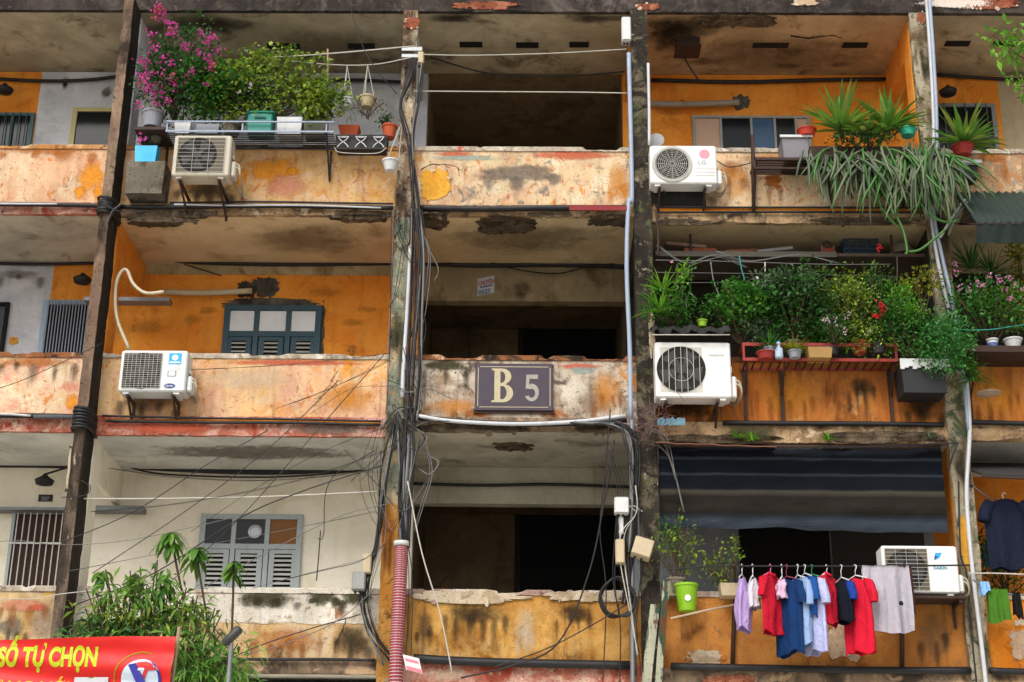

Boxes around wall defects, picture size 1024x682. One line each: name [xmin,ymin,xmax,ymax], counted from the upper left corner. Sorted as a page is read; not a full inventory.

peeling [452,0,521,11]
peeling [965,0,1020,11]
leakage [652,19,716,49]
peeling [415,168,452,229]
spalling [120,209,218,225]
spalling [326,209,391,223]
leakage [849,380,874,403]
spalling [414,423,534,451]
leakage [332,597,346,613]
leakage [445,607,492,633]
spalling [410,589,625,607]
leakage [564,606,590,622]